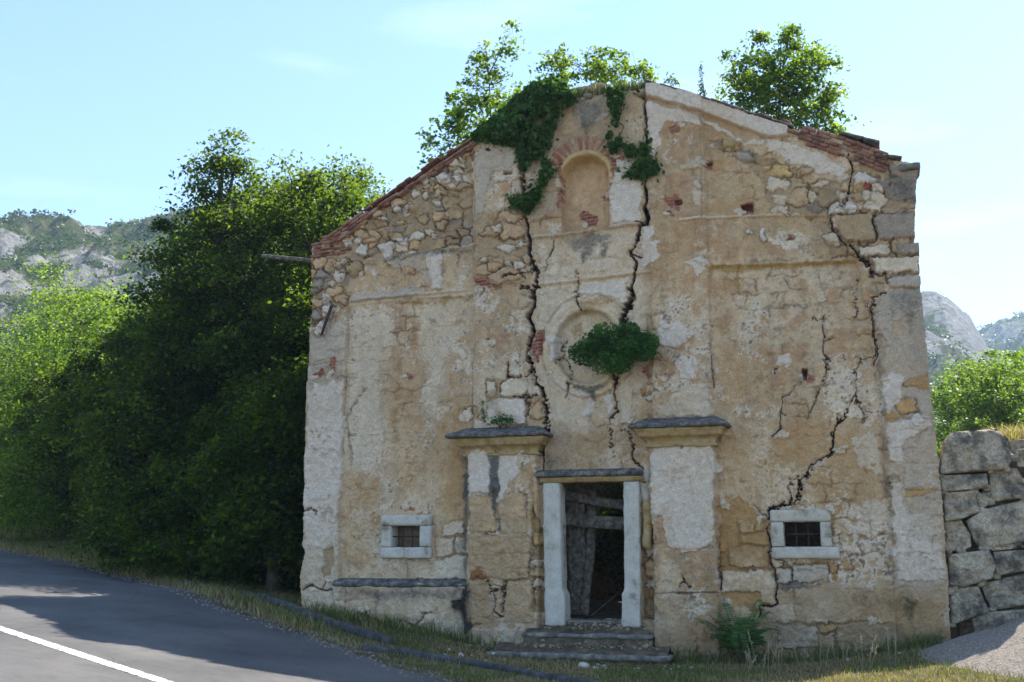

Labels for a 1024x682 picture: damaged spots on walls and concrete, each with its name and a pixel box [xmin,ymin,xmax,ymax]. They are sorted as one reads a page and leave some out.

spalling [303,94,665,632]
crack [503,216,573,454]
crack [609,376,646,483]
crack [619,179,651,324]
spalling [645,100,919,302]
crack [759,153,888,616]